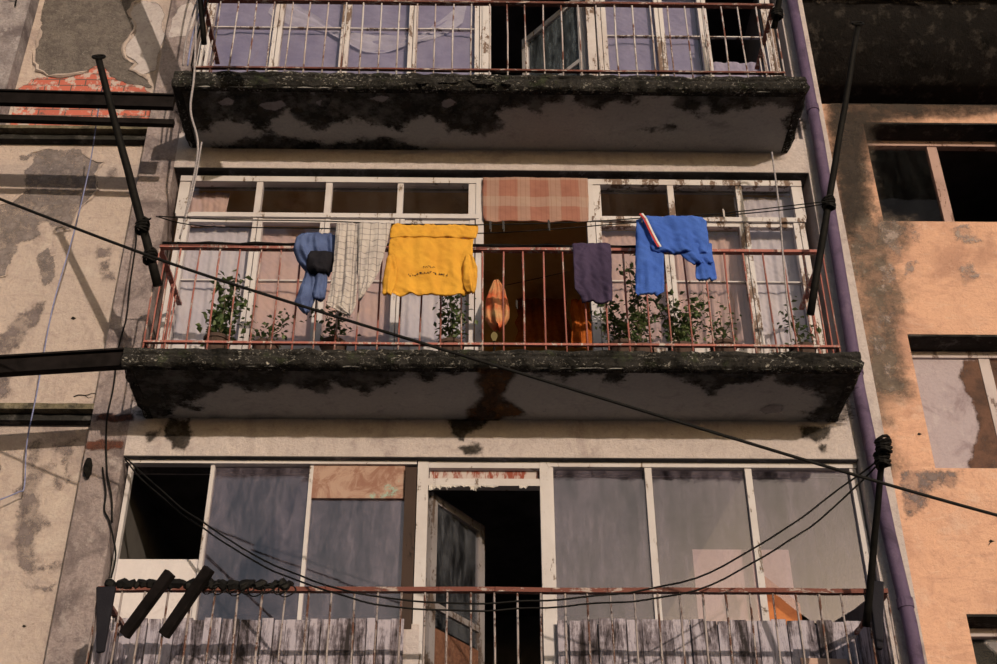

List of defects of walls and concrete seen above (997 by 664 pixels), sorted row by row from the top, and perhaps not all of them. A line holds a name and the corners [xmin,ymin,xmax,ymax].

spalling [18,0,199,93]
flaking render [10,107,151,126]
water stain [174,84,806,150]
peeling [0,148,116,279]
peeling [38,248,55,285]
water stain [642,157,910,451]
water stain [128,360,489,454]
water stain [516,366,629,384]
water stain [15,440,55,572]